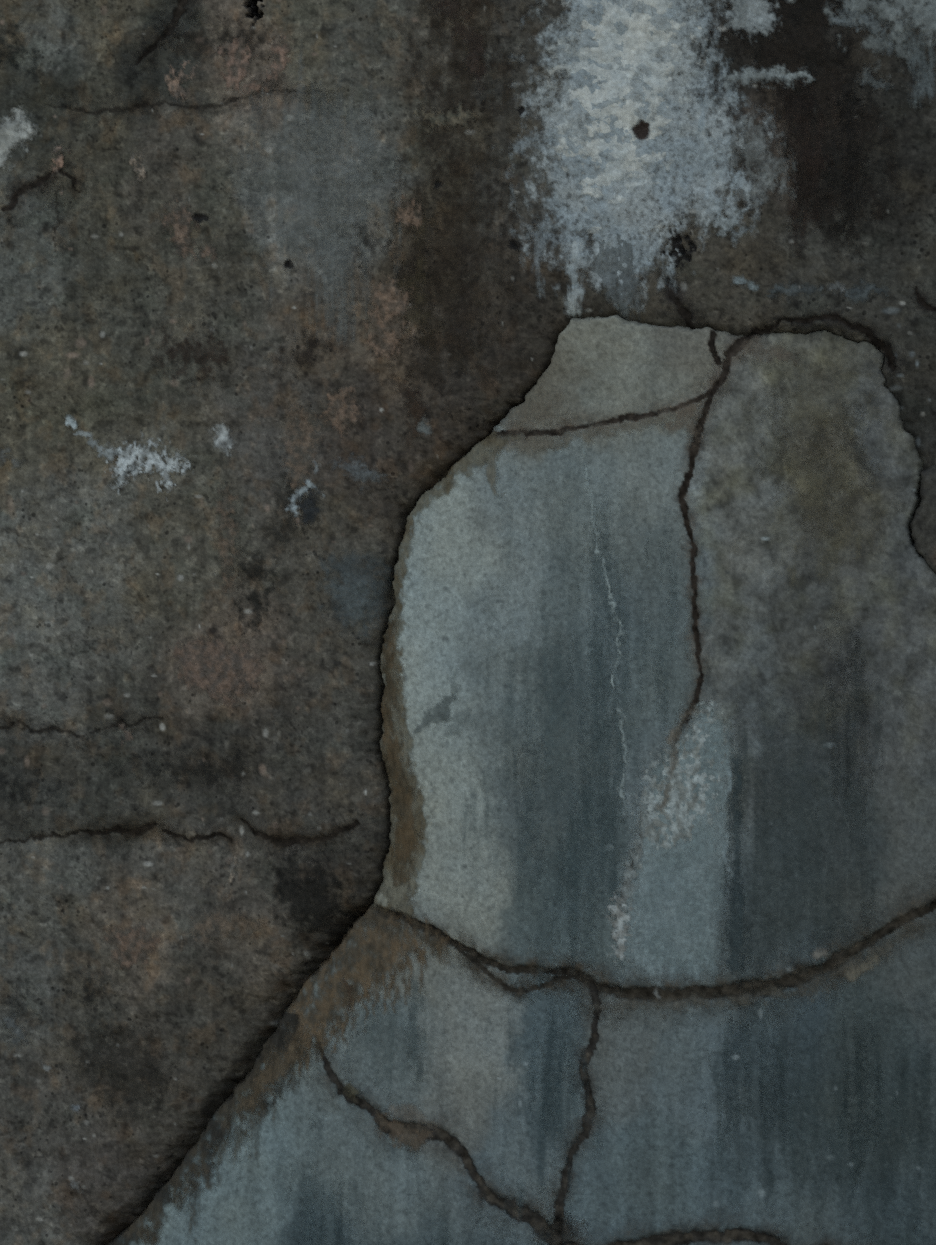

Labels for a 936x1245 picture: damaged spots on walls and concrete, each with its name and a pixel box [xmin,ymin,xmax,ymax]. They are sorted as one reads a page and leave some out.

leakage [514,0,936,319]
spalling [396,195,422,226]
spalling [367,278,408,357]
crack [914,286,936,312]
spalling [323,387,359,437]
crack [494,277,897,941]
crack [0,817,360,847]
leakage [608,702,831,979]
crack [320,895,936,1245]